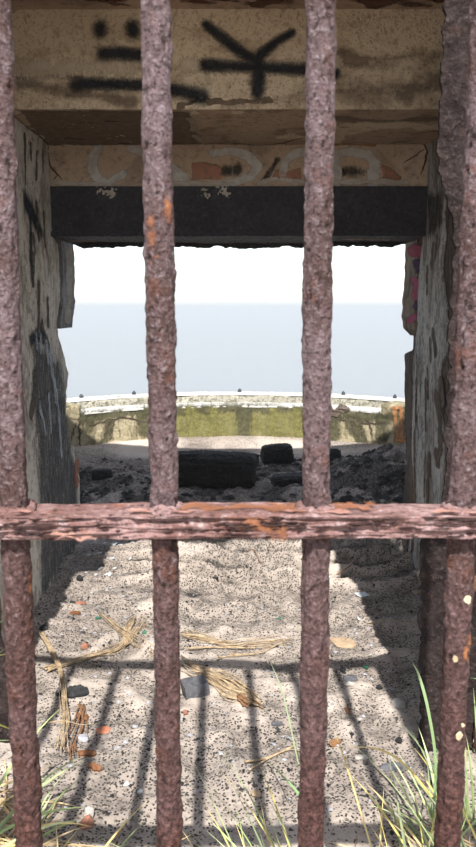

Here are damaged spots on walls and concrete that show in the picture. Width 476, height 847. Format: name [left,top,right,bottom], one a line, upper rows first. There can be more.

spalling [172,96,273,145]
spalling [21,111,142,185]
corrosion [164,199,172,224]
corrosion [147,217,155,246]
leakage [176,401,303,438]
leakage [330,407,405,443]